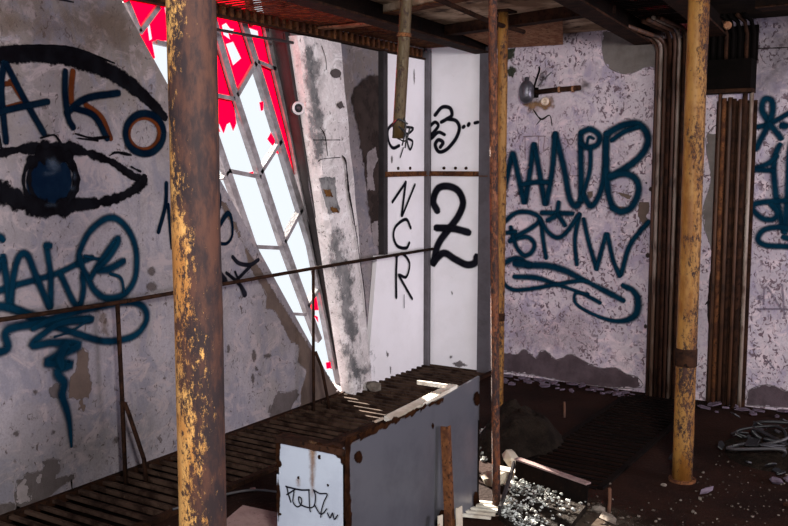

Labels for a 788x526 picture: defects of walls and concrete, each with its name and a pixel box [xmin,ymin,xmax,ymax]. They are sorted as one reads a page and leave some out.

leakage [305,43,326,164]
leakage [351,75,379,248]
leakage [330,227,371,389]
flaking render [49,347,92,412]
flaking render [504,349,643,389]
flaking render [745,384,788,408]